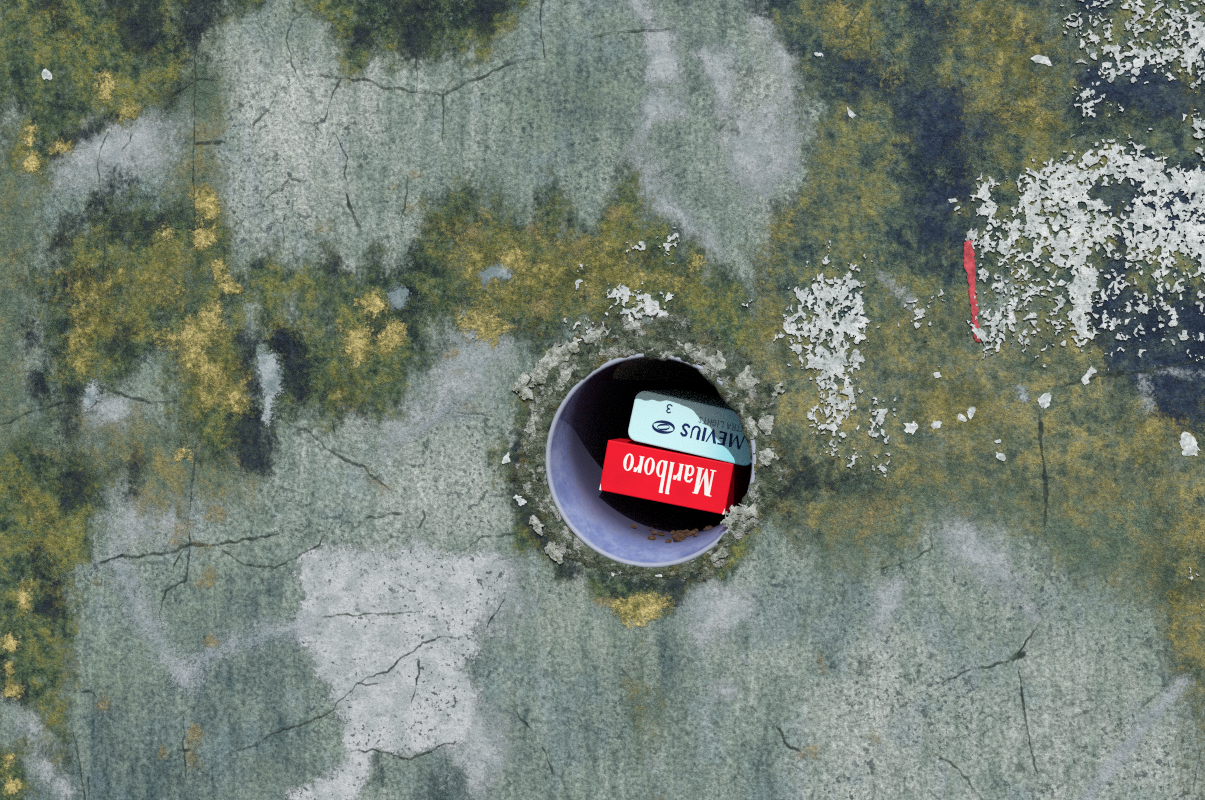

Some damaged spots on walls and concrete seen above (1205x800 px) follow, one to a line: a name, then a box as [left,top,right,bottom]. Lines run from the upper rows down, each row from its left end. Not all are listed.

damp [45,76,192,196]
crack [286,0,545,225]
damp [706,0,810,211]
peeling [948,0,1205,385]
damp [64,389,151,440]
damp [373,322,519,465]
peeling [773,240,946,477]
peeling [1012,385,1052,409]
peeling [1179,432,1201,456]
crack [100,444,331,618]
crack [232,598,505,752]
crack [359,742,465,760]